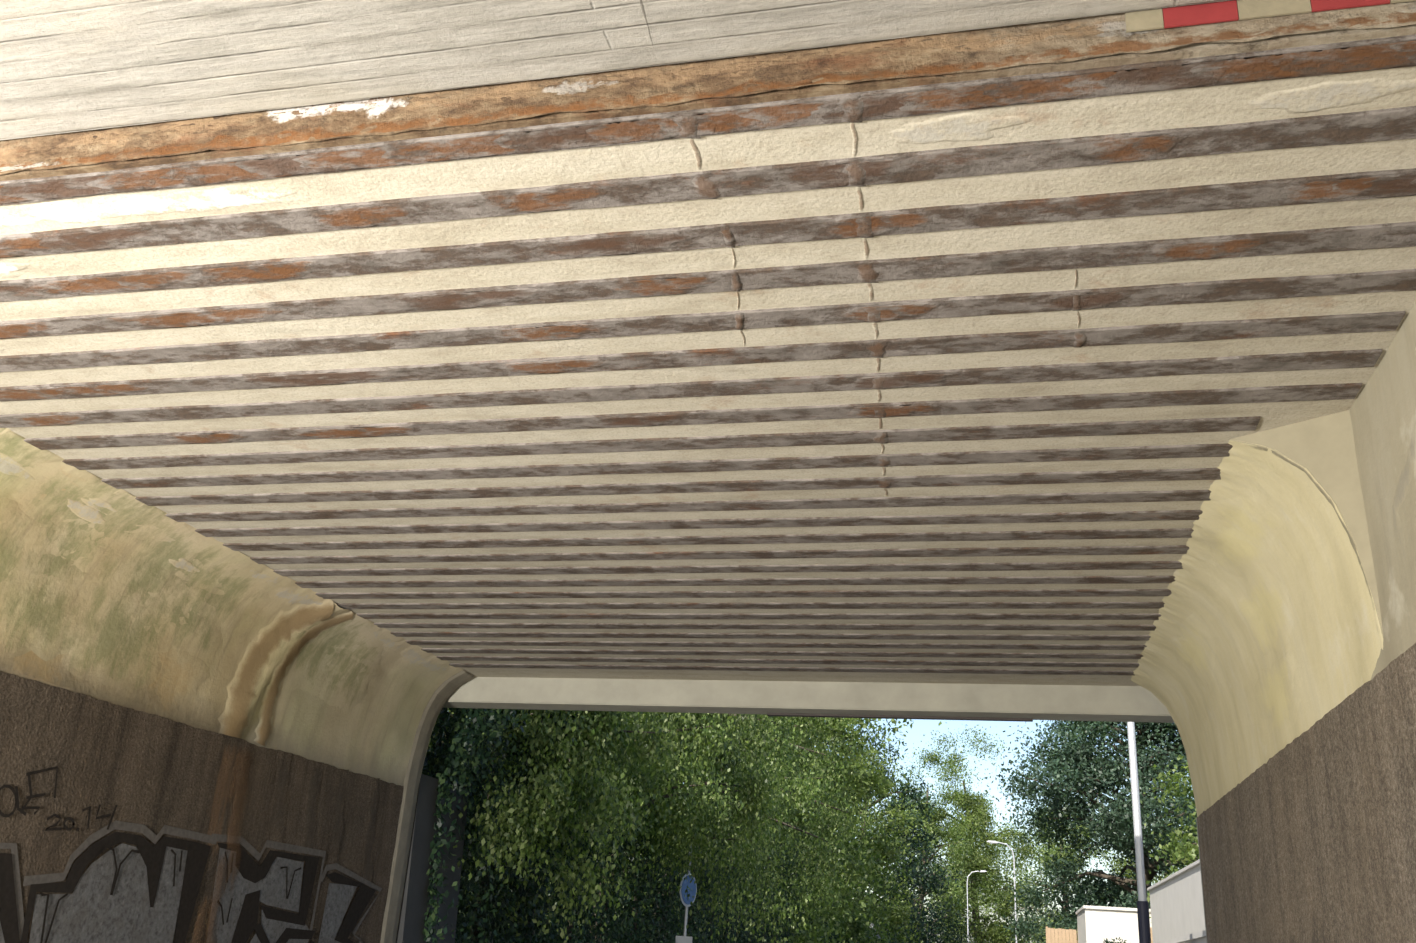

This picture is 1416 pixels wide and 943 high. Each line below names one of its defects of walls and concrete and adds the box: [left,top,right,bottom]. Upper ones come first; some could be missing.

spalling [50,17,1130,148]
rust [0,9,1416,497]
peeling [0,452,35,481]
water stain [33,464,94,509]
peeling [67,498,117,525]
water stain [0,650,76,691]